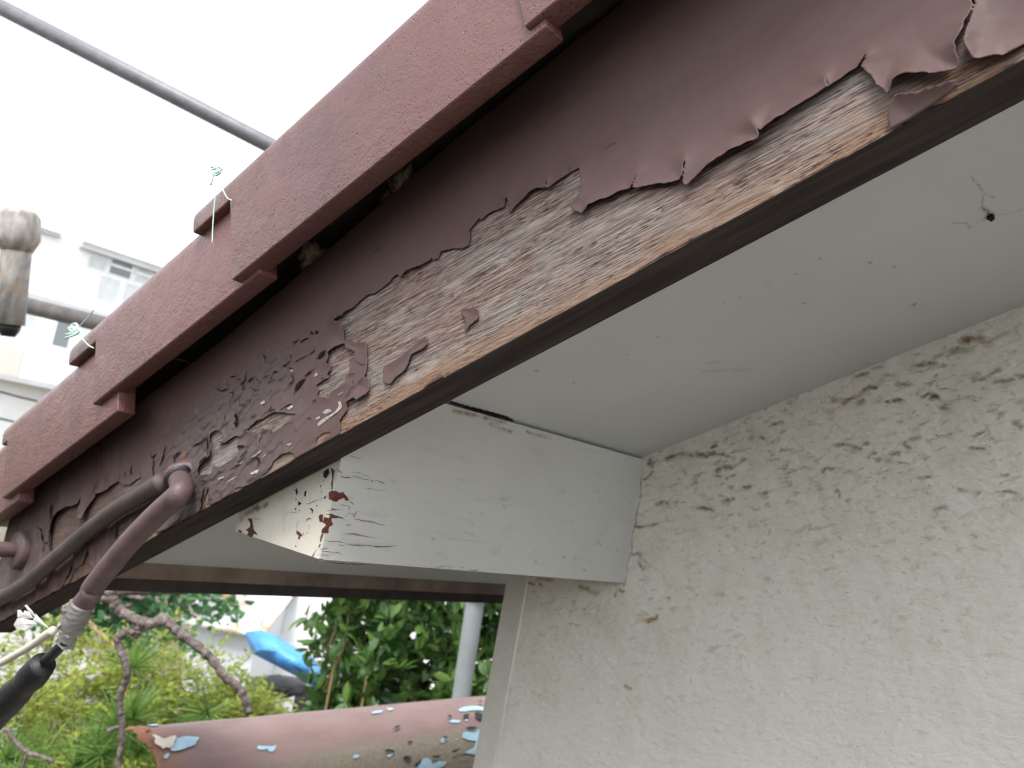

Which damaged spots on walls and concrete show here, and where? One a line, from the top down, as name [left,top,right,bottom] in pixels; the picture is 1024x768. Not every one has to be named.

peeling [313,0,1024,449]
peeling [50,477,141,552]
peeling [238,518,257,537]
peeling [198,401,300,511]
peeling [295,468,349,562]
crack [290,456,397,565]